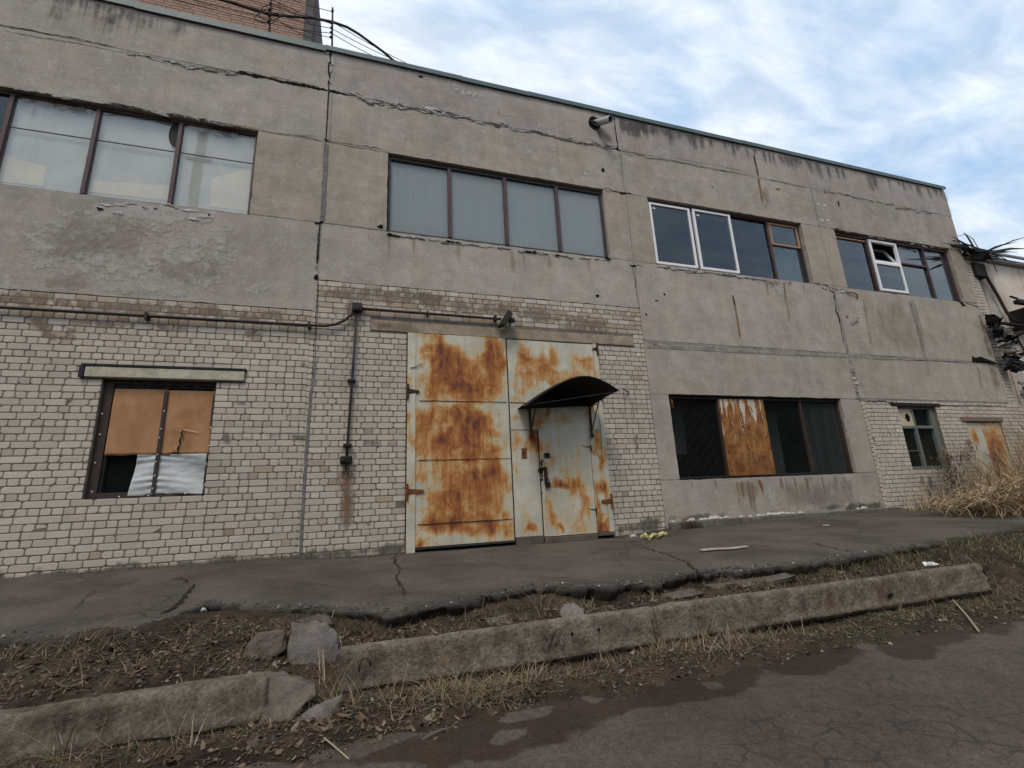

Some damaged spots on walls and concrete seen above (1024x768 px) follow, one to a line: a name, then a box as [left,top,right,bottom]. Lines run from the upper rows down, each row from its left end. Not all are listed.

crack [0,25,161,60]
crack [325,51,334,88]
crack [261,130,382,150]
flaking render [21,201,235,292]
spalling [377,224,611,261]
corrosion [718,399,776,510]
corrosion [342,468,354,527]
crack [155,577,196,615]
crack [392,557,406,602]